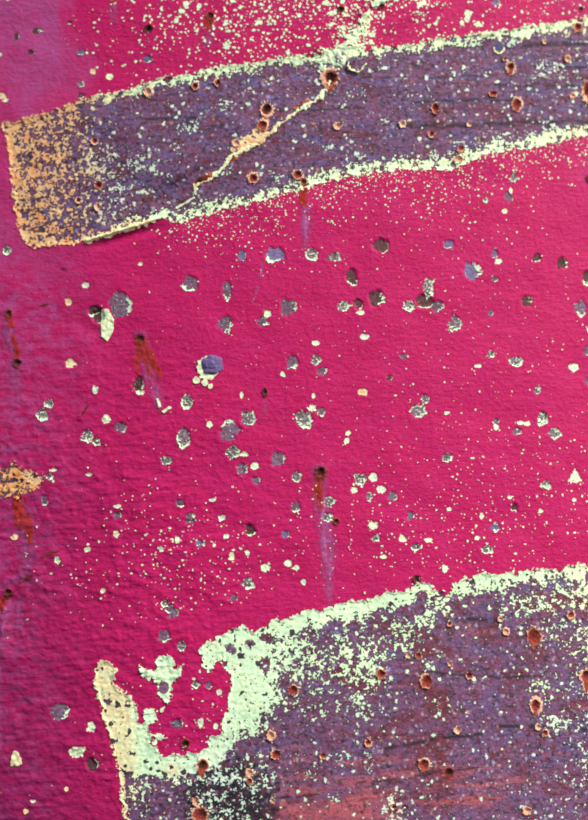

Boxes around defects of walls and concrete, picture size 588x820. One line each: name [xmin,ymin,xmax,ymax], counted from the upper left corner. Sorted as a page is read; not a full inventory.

crack [176,80,331,209]
peeling [1,0,588,249]
corrosion [5,312,20,381]
peeling [88,292,133,341]
corrosion [135,333,162,397]
peeling [207,411,260,485]
peeling [293,393,326,429]
peeling [512,411,563,440]
peeling [0,460,57,506]
peeling [351,473,397,502]
corrosion [313,465,334,597]
peeling [86,561,588,820]